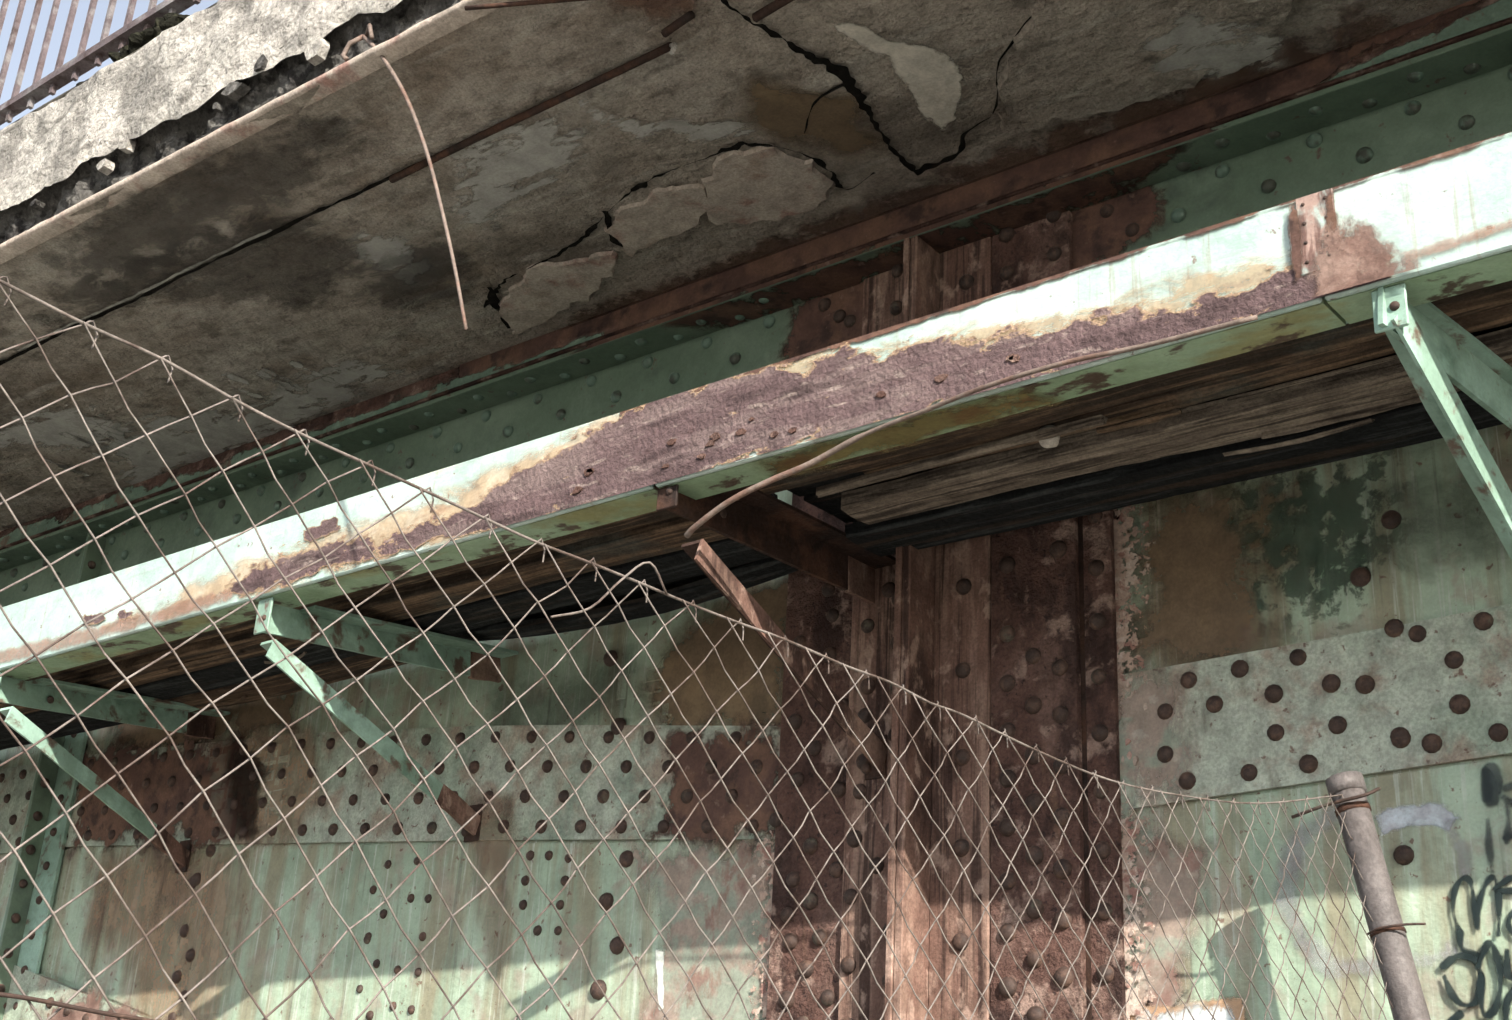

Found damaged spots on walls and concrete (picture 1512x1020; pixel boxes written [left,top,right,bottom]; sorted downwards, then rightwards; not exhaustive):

damp [0,360,401,485]
spalling [0,0,589,244]
damp [352,234,431,284]
spalling [499,143,833,335]
rust [0,0,1512,662]
crack [484,0,1032,329]
rust [50,727,318,1020]